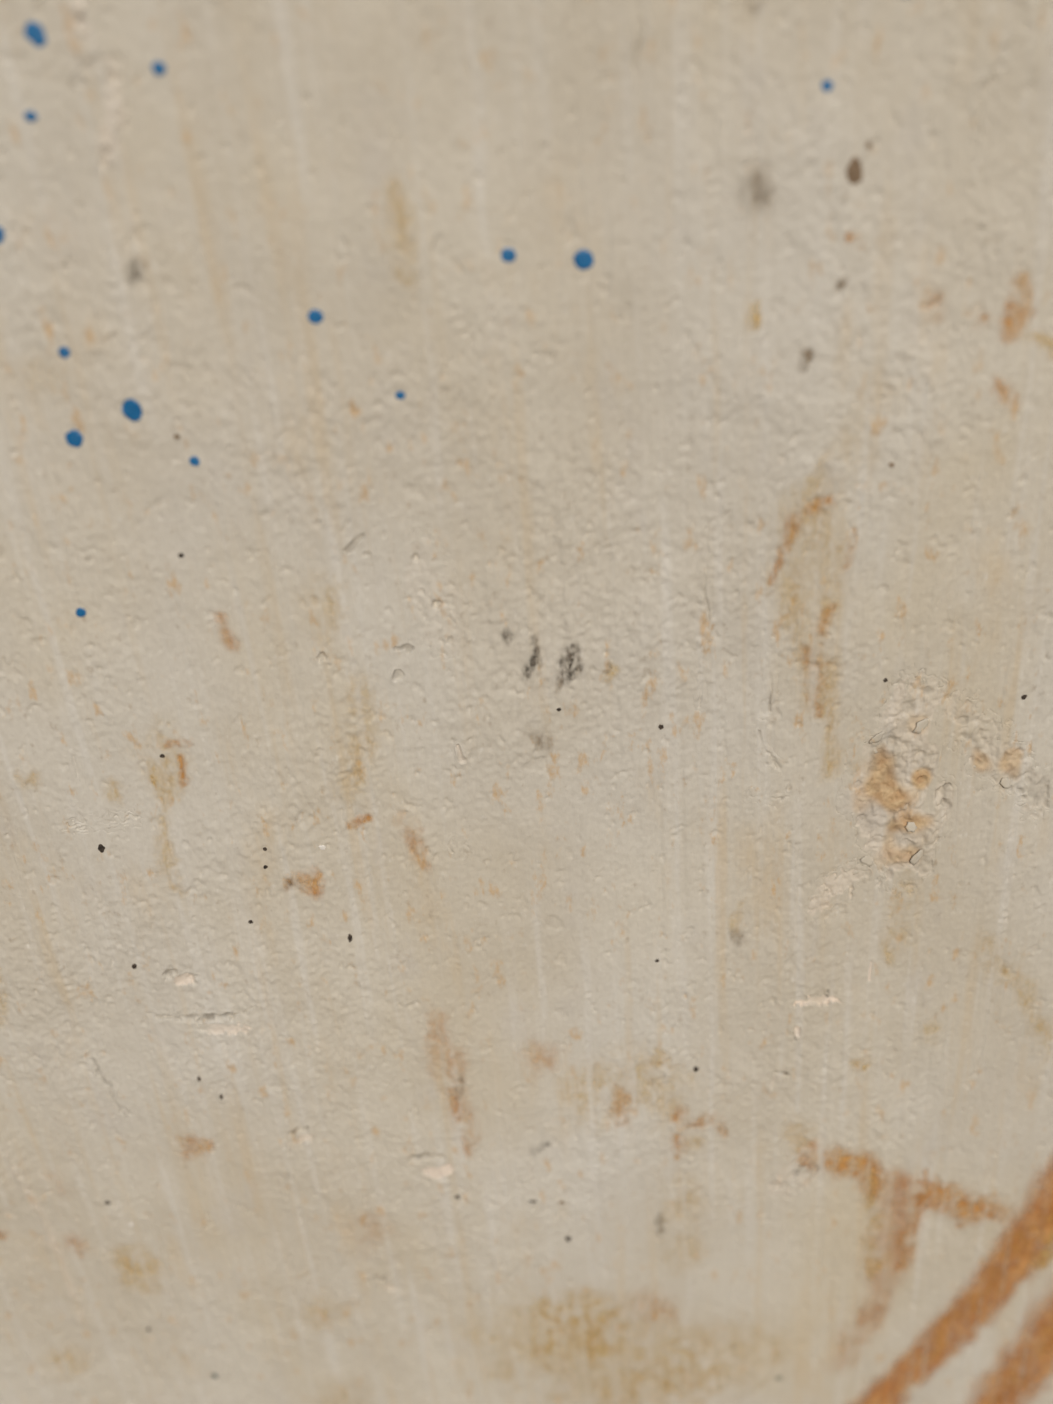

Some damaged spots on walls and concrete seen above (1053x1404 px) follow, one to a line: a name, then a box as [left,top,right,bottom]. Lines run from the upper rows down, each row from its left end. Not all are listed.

spalling [804,662,1053,924]
rust [826,1151,880,1202]
rust [863,1171,1053,1404]